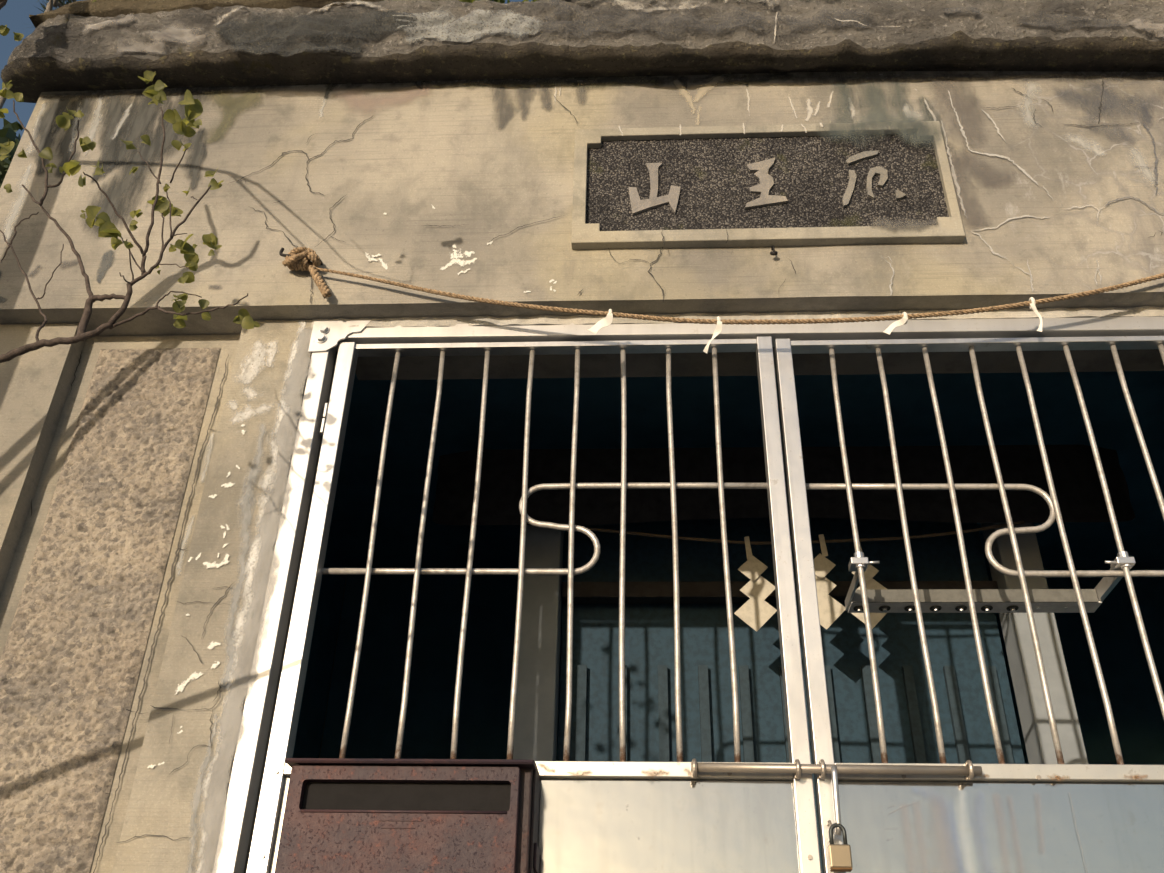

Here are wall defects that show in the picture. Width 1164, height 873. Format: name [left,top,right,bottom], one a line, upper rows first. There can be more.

water stain [320,71,1164,143]
water stain [5,85,286,239]
crack [230,117,372,247]
water stain [874,219,937,230]
water stain [948,154,1010,226]
crack [924,80,1164,292]
water stain [97,250,114,283]
peeling [440,245,477,275]
crack [608,232,666,301]
peeling [188,524,230,568]
peeling [174,641,221,695]